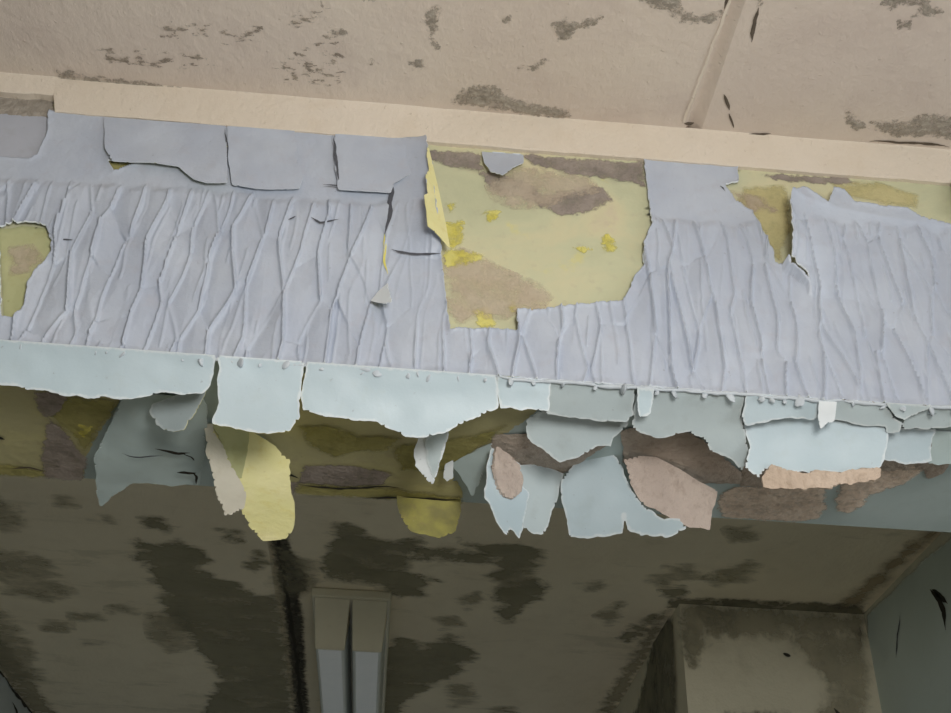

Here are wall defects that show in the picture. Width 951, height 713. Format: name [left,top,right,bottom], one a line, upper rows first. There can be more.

peeling [0,97,55,158]
peeling [104,117,303,190]
peeling [334,134,411,193]
peeling [424,145,650,330]
peeling [727,170,951,264]
peeling [0,339,951,541]
water stain [135,541,293,713]
water stain [294,523,546,620]
water stain [385,618,477,713]
water stain [638,641,658,713]
water stain [658,531,937,614]
crack [930,589,948,630]